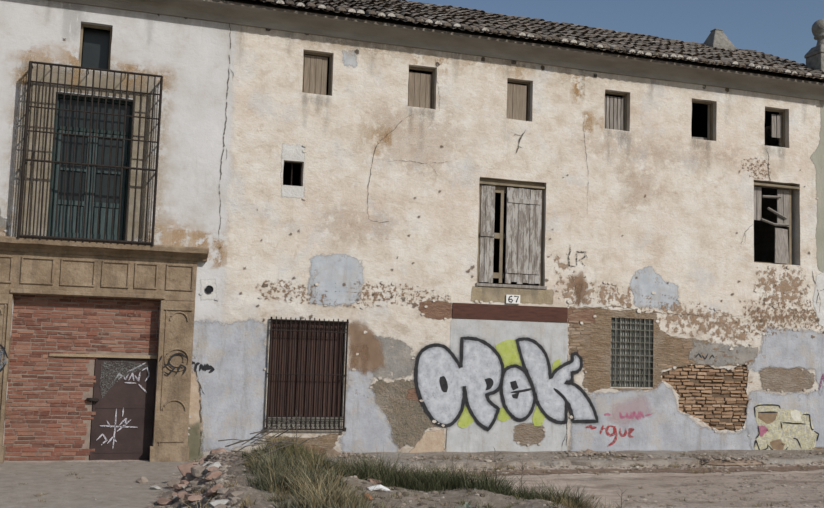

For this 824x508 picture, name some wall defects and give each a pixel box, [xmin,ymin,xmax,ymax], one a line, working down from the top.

crack [219,24,234,230]
crack [367,117,407,223]
flaking render [256,277,452,320]
spalling [466,254,824,436]
spalling [370,377,445,449]